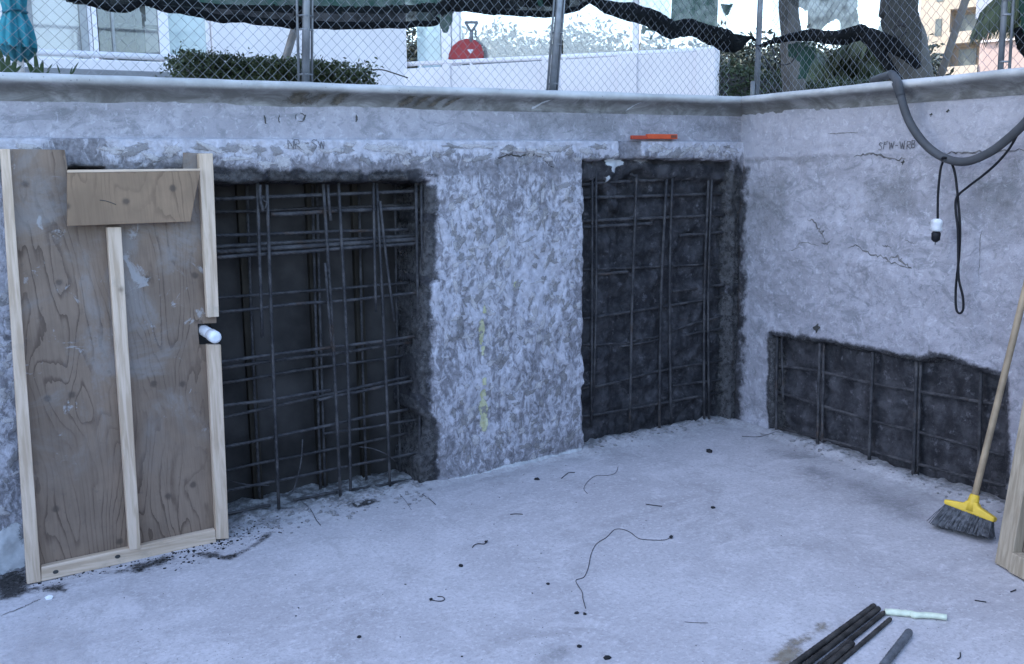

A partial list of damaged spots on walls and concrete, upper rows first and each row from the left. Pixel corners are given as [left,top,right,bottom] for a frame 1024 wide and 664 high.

crack [828,132,905,161]
spalling [214,183,424,515]
spalling [98,141,738,463]
crack [789,219,914,269]
spalling [774,324,1006,495]